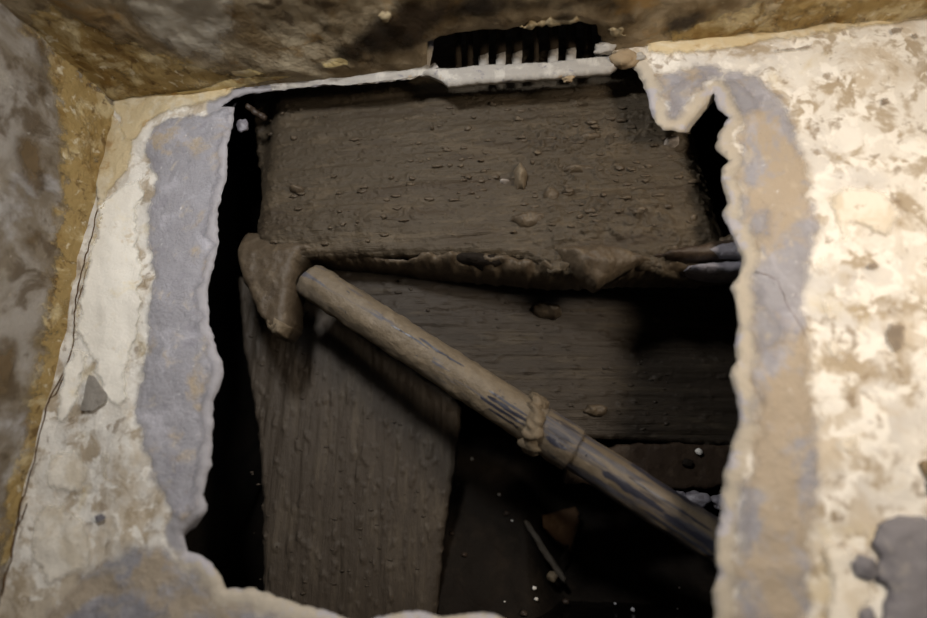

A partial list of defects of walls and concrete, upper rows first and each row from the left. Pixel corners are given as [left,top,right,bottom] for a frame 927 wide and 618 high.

flaking render [270,62,438,90]
peeling [832,187,898,237]
flaking render [58,94,264,592]
flaking render [657,66,819,618]
spalling [427,379,514,438]
peeling [46,448,87,491]
spalling [592,438,668,447]
flaking render [918,460,927,491]
flaking render [32,504,275,618]
flaking render [825,515,927,618]